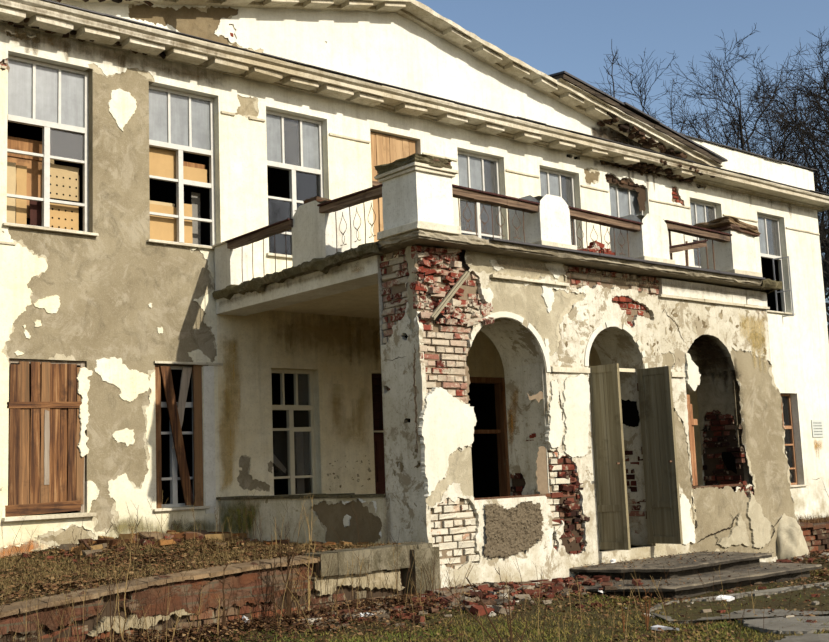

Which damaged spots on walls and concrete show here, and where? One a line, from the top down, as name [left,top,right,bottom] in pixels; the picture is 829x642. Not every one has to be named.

spalling [2,18,94,43]
flaking render [83,0,263,53]
flaking render [235,95,259,118]
spalling [584,111,715,211]
flaking render [0,63,217,558]
flaking render [380,245,798,569]
flaking render [237,455,270,493]
flaking render [311,498,382,545]
crack [698,514,738,546]